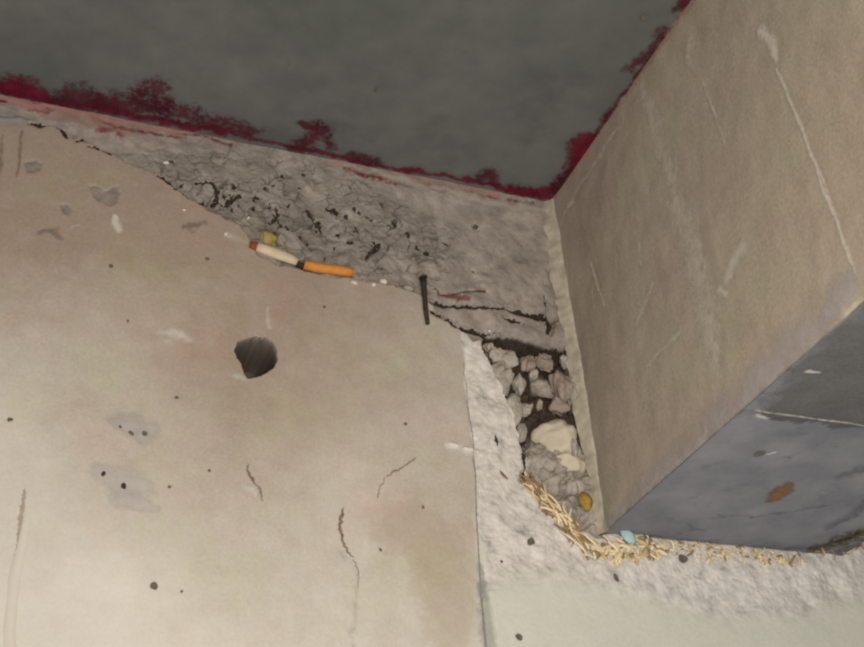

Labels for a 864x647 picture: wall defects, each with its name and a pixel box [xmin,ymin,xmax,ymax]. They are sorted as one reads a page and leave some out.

water stain [343,162,546,213]
water stain [112,214,122,233]
flaking render [0,102,622,546]
crack [429,288,566,378]
crack [246,464,263,501]
crack [377,457,415,499]
peeling [457,332,864,642]
rust [766,483,793,502]
crack [338,509,359,586]